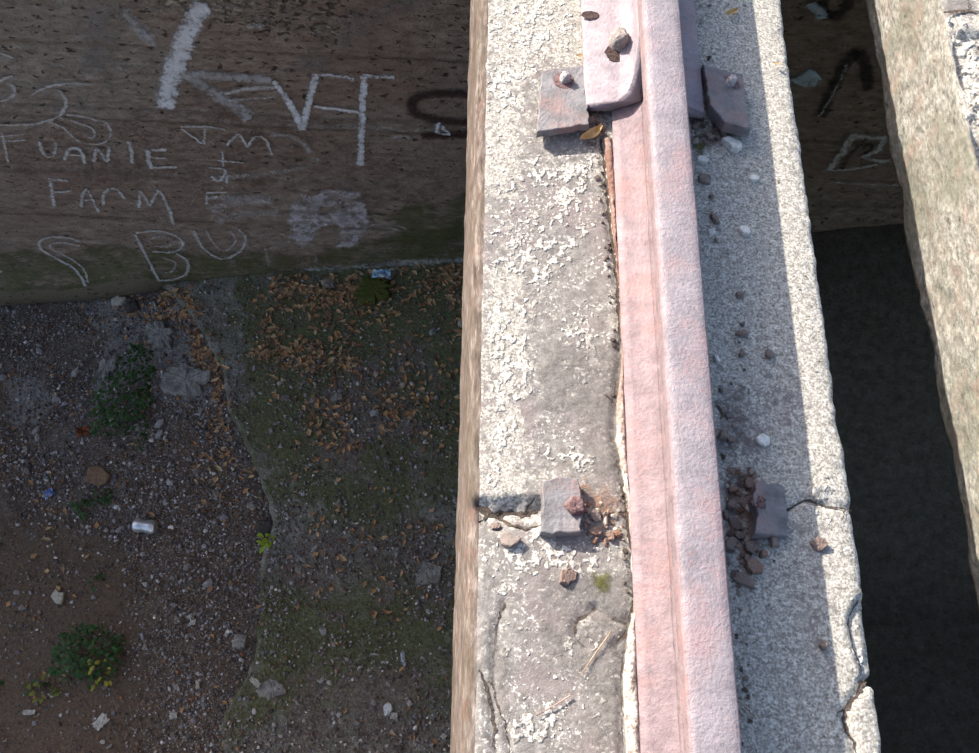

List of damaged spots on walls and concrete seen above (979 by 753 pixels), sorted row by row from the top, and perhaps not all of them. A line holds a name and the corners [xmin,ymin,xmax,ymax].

rust [553,72,574,89]
crack [477,498,541,531]
crack [786,493,852,520]
crack [478,603,510,753]
crack [837,600,866,753]